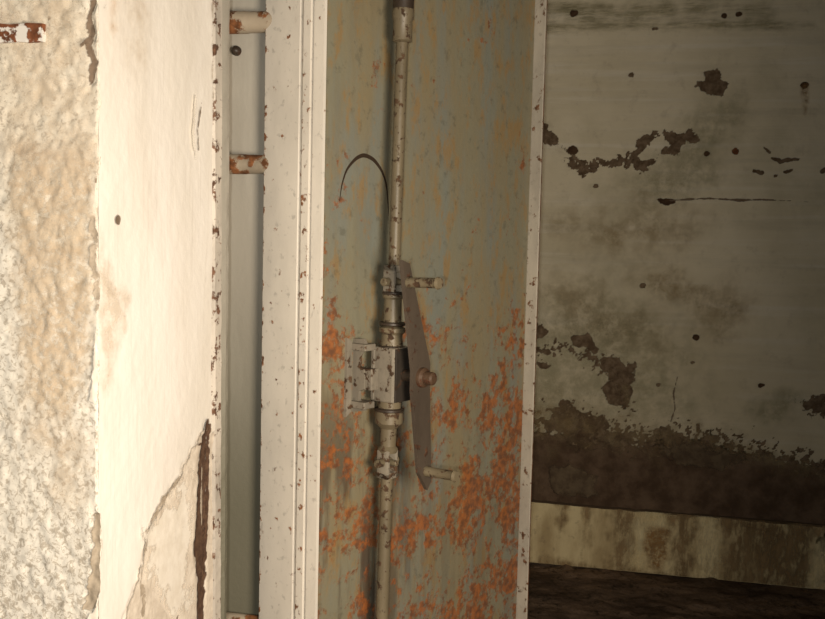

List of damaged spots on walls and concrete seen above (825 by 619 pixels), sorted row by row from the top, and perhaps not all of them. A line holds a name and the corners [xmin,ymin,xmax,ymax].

peeling [694,69,729,97]
peeling [543,123,700,178]
water stain [11,144,94,410]
flaking render [532,323,825,525]
flaking render [82,513,101,619]
peeling [127,428,215,619]
water stain [669,514,825,589]